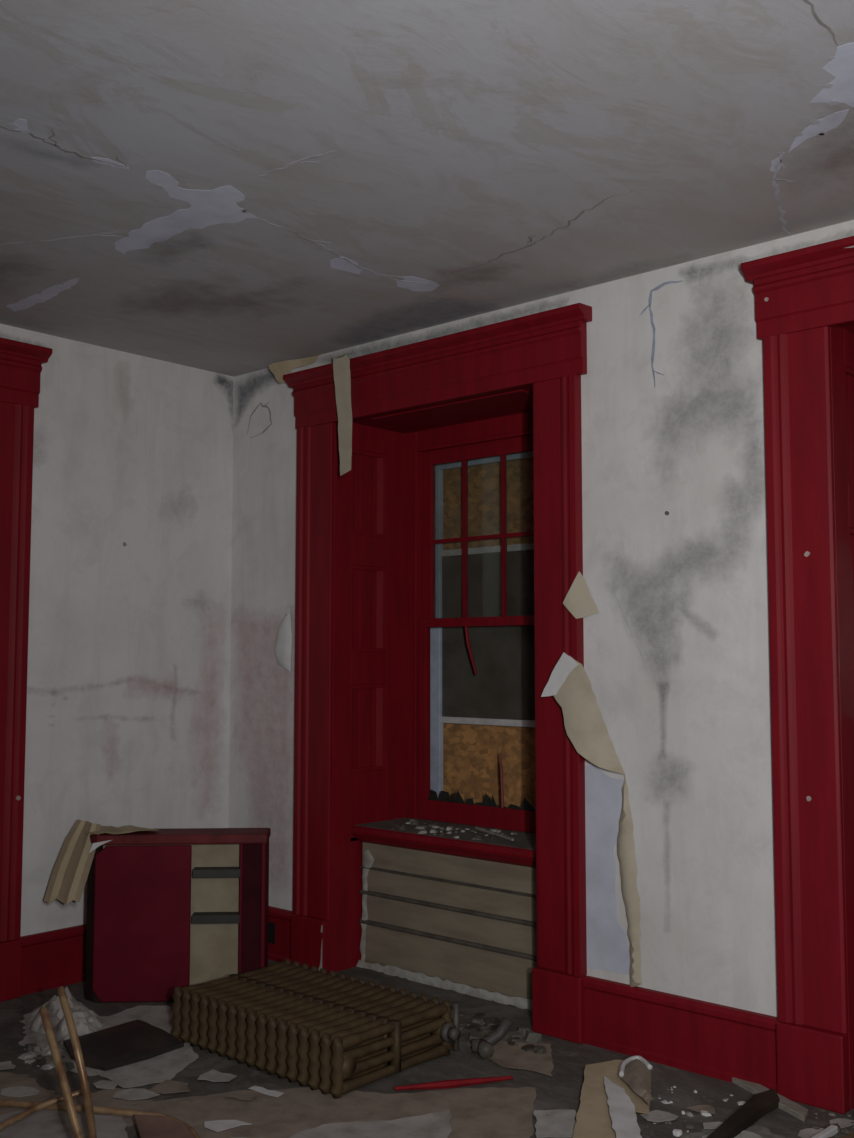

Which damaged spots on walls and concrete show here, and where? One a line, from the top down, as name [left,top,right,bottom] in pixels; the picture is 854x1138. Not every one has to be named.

crack [803,0,838,46]
peeling [770,43,854,172]
peeling [114,170,256,255]
crack [440,190,632,277]
peeling [6,278,79,312]
crack [639,280,683,387]
peeling [541,652,578,697]
flaking render [585,766,630,975]
leakage [617,775,642,987]